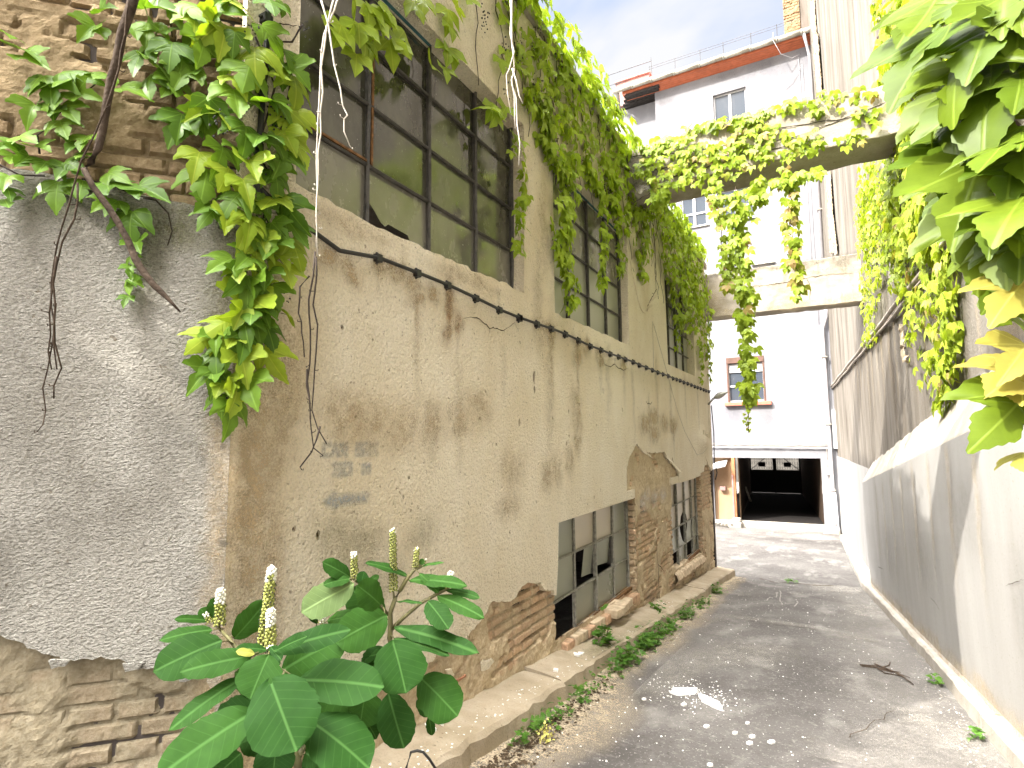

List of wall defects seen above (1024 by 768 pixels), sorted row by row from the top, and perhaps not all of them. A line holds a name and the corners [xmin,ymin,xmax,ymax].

spalling [219,0,243,27]
spalling [0,0,239,205]
spalling [424,446,715,702]
spalling [0,635,214,768]
spalling [237,747,255,768]
spalling [377,686,427,725]